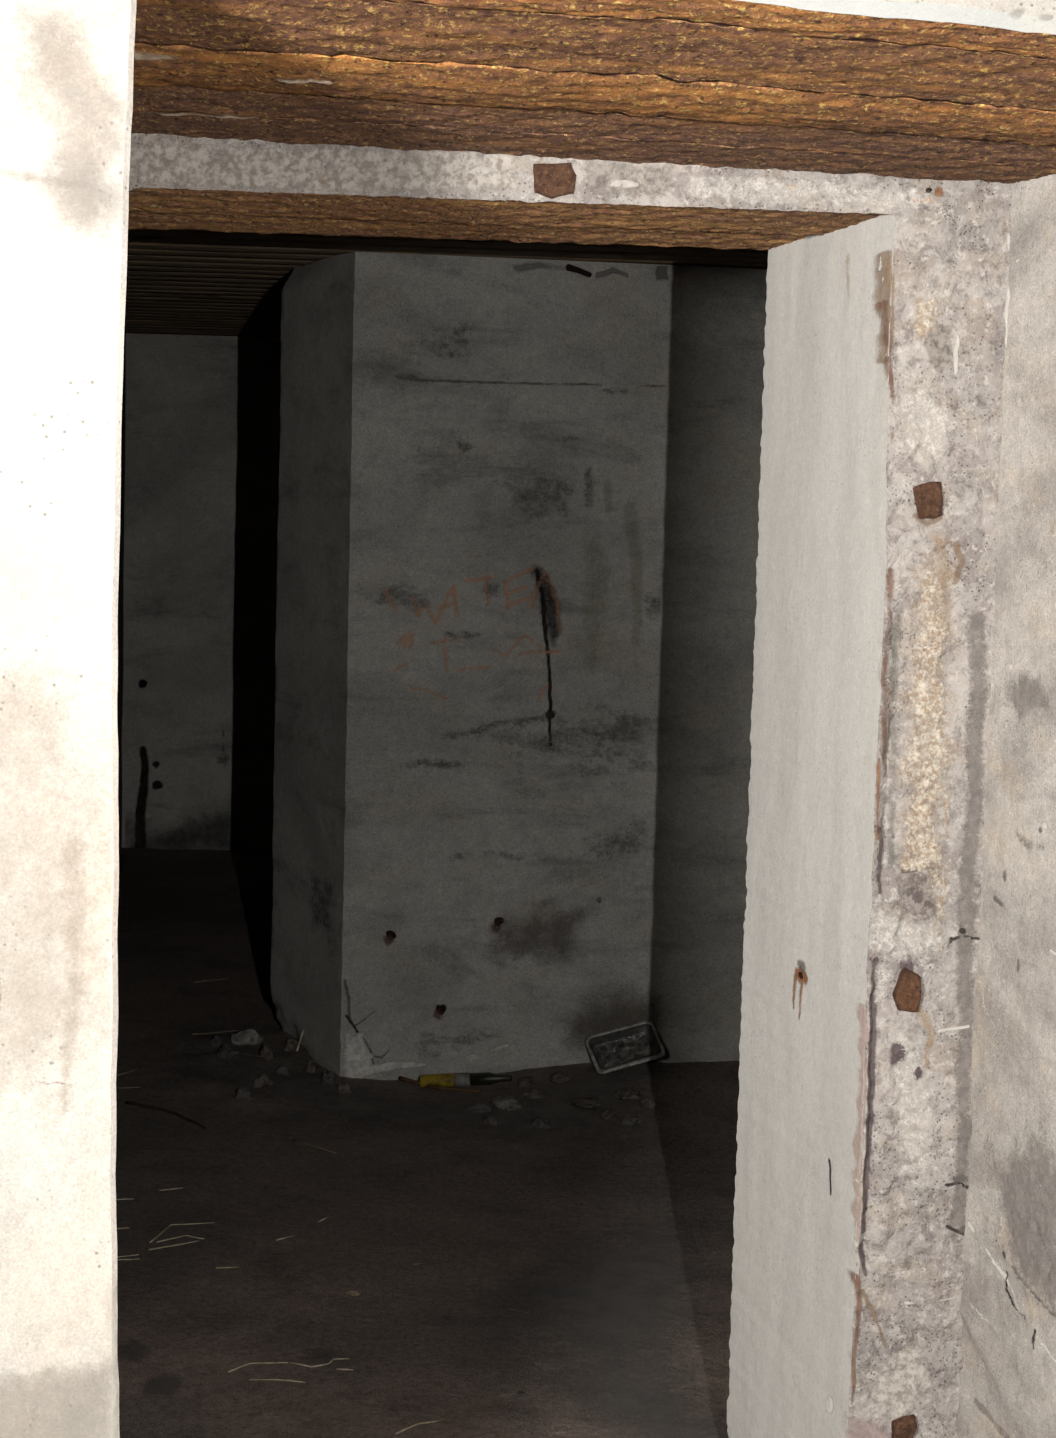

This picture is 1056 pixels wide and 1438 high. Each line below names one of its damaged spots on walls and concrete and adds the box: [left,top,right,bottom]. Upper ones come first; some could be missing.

corrosion [792,961,808,1019]